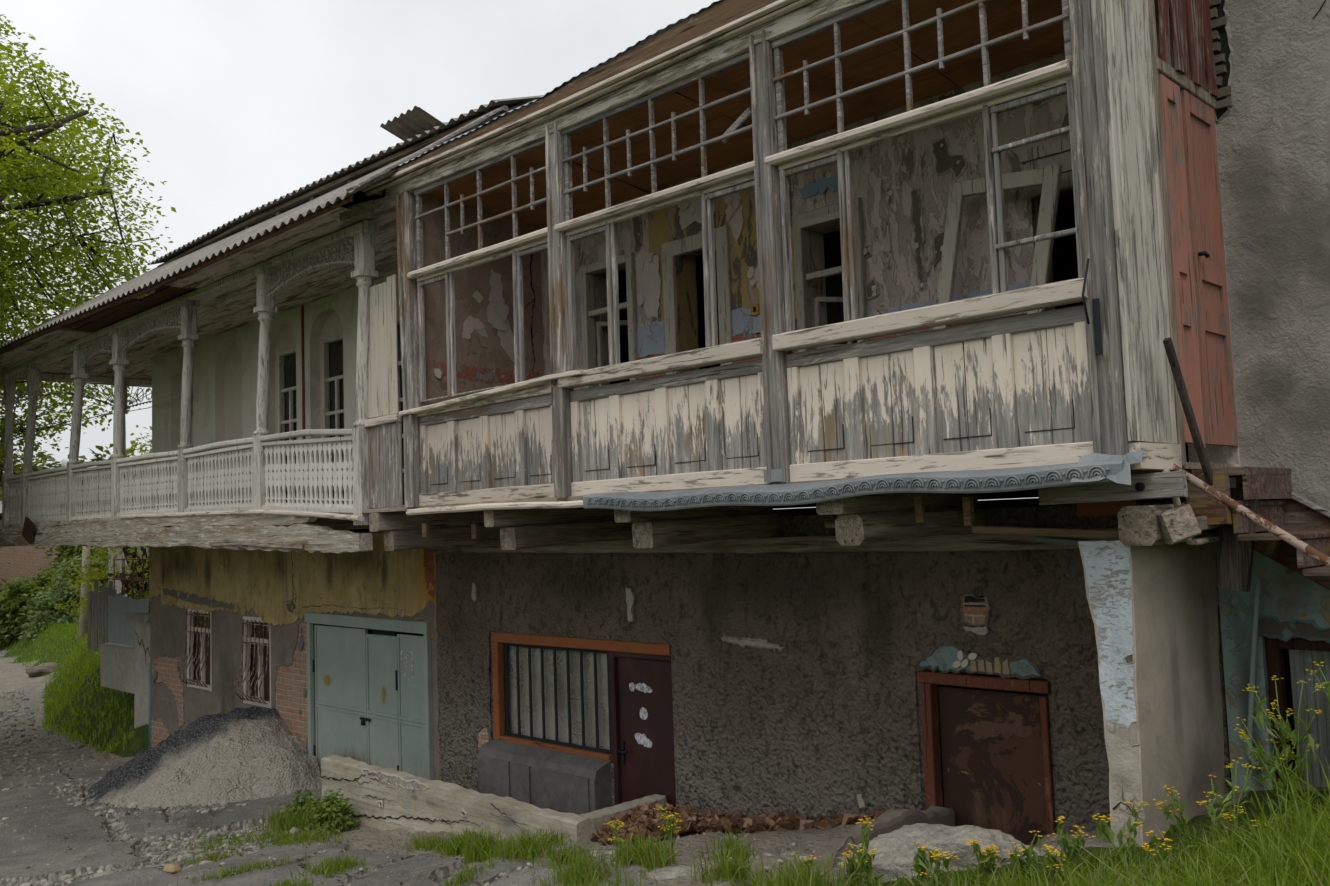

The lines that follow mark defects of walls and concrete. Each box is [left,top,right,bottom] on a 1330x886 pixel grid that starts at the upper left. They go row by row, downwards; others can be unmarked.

peeling [936,88,963,102]
peeling [931,136,967,180]
peeling [632,216,661,318]
peeling [677,192,744,241]
peeling [910,188,945,291]
flaking render [275,599,308,753]
peeling [1079,540,1145,847]